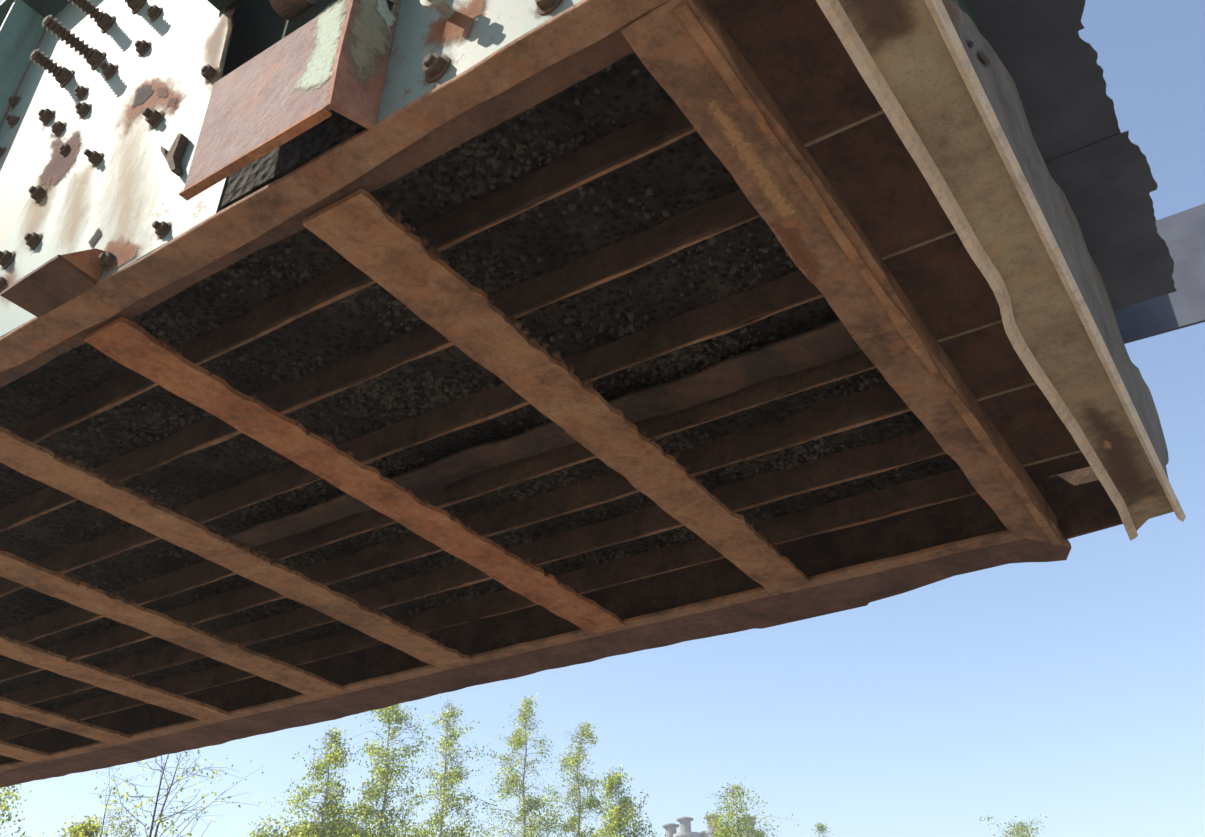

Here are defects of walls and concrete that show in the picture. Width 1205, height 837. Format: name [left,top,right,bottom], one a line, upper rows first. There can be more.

peeling [294,0,400,90]
rust [425,0,484,47]
rust [122,77,184,133]
rust [31,129,84,230]